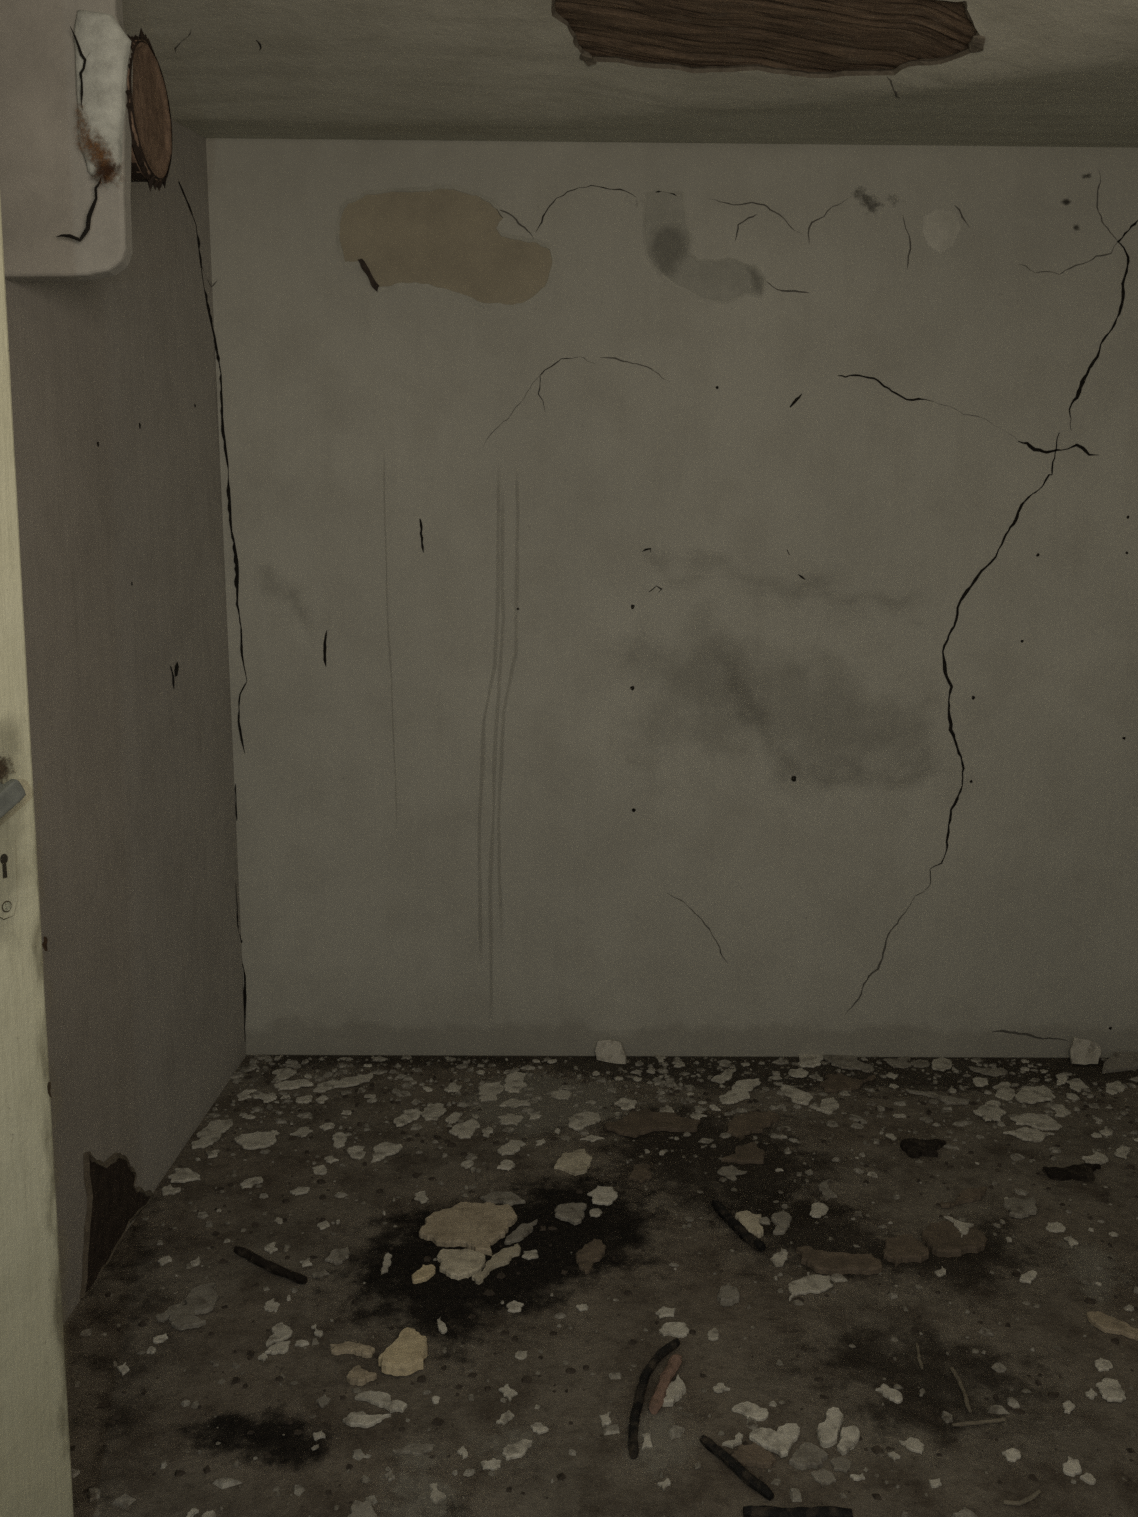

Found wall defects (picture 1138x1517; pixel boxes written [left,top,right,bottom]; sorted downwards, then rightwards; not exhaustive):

crack [70,26,91,109]
spalling [551,0,985,78]
crack [56,180,101,242]
crack [536,185,676,231]
crack [713,196,851,240]
crack [767,282,809,293]
crack [487,357,670,439]
crack [178,182,247,820]
crack [838,172,1138,1012]
crack [669,894,726,961]
crack [236,892,247,1042]